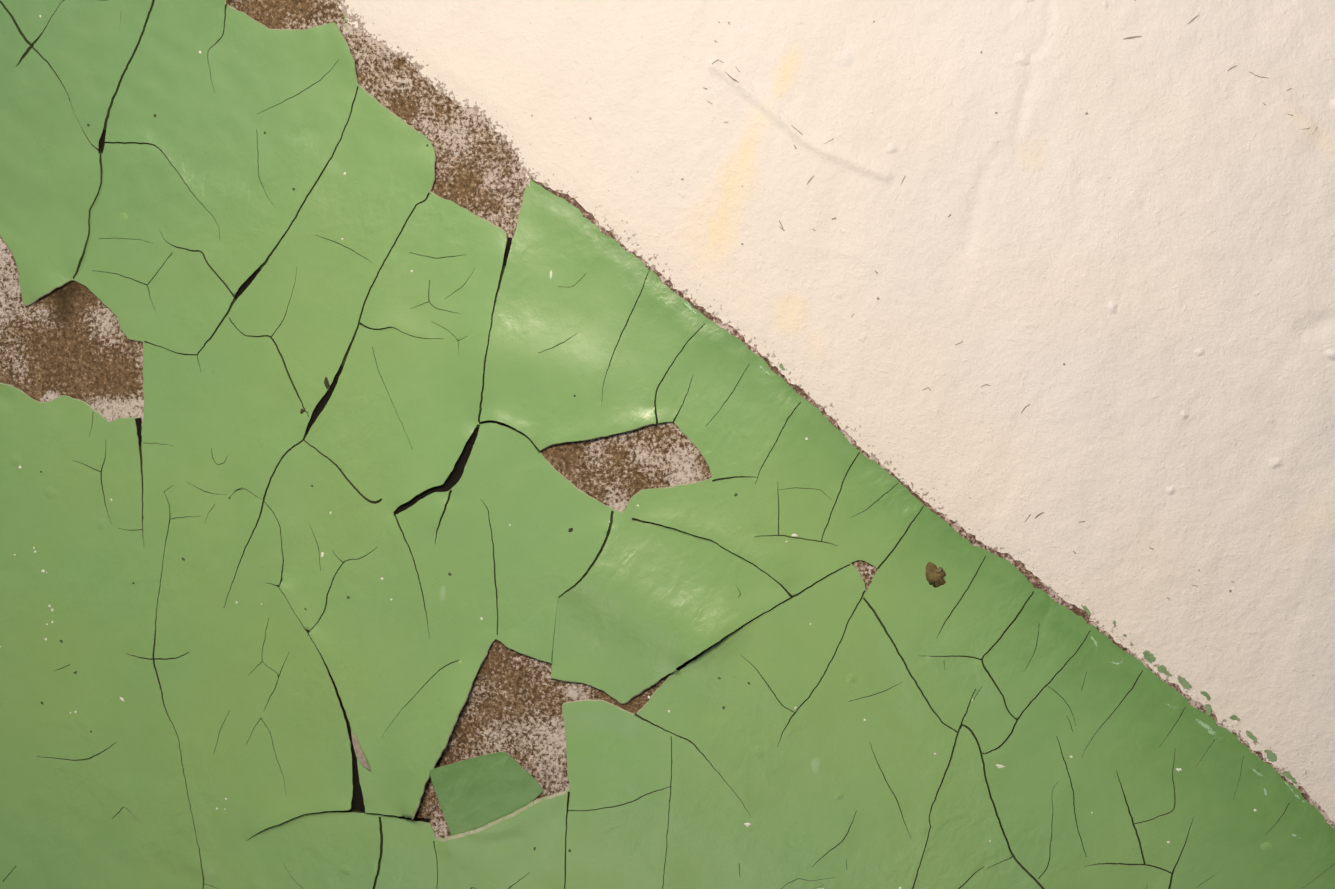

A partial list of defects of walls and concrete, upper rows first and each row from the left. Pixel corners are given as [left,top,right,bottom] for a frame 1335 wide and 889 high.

peeling [0,3,193,424]
crack [0,0,542,889]
peeling [105,0,790,839]
crack [601,268,651,403]
crack [654,324,750,426]
spalling [531,177,1335,830]